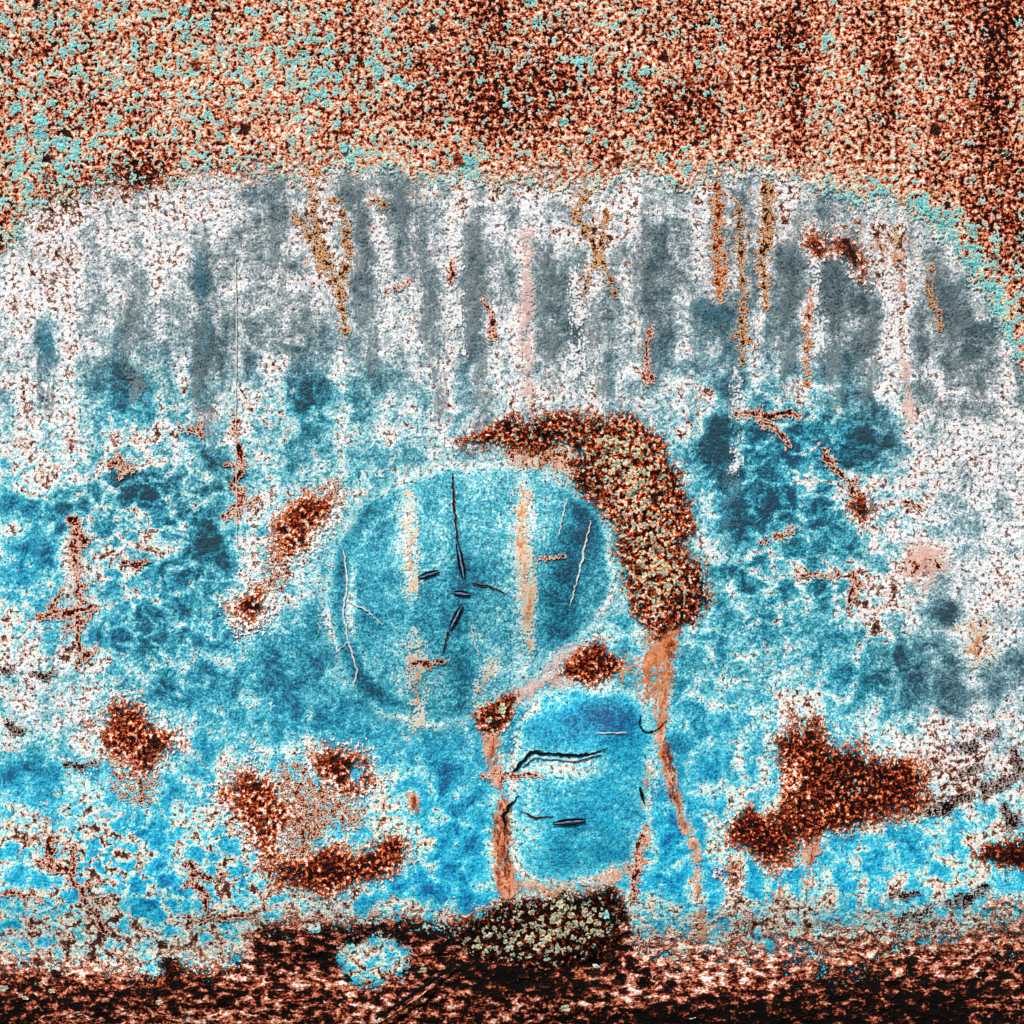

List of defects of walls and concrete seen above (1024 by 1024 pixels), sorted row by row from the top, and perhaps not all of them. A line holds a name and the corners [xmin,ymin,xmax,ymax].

corrosion [0,0,1024,380]
damp [35,325,60,418]
damp [339,170,495,450]
damp [532,236,611,399]
damp [687,296,748,556]
damp [770,236,905,417]
damp [394,487,424,601]
damp [402,626,430,735]
crack [404,473,508,674]
corrosion [0,227,1024,1024]
damp [510,481,539,655]
crack [479,747,608,830]